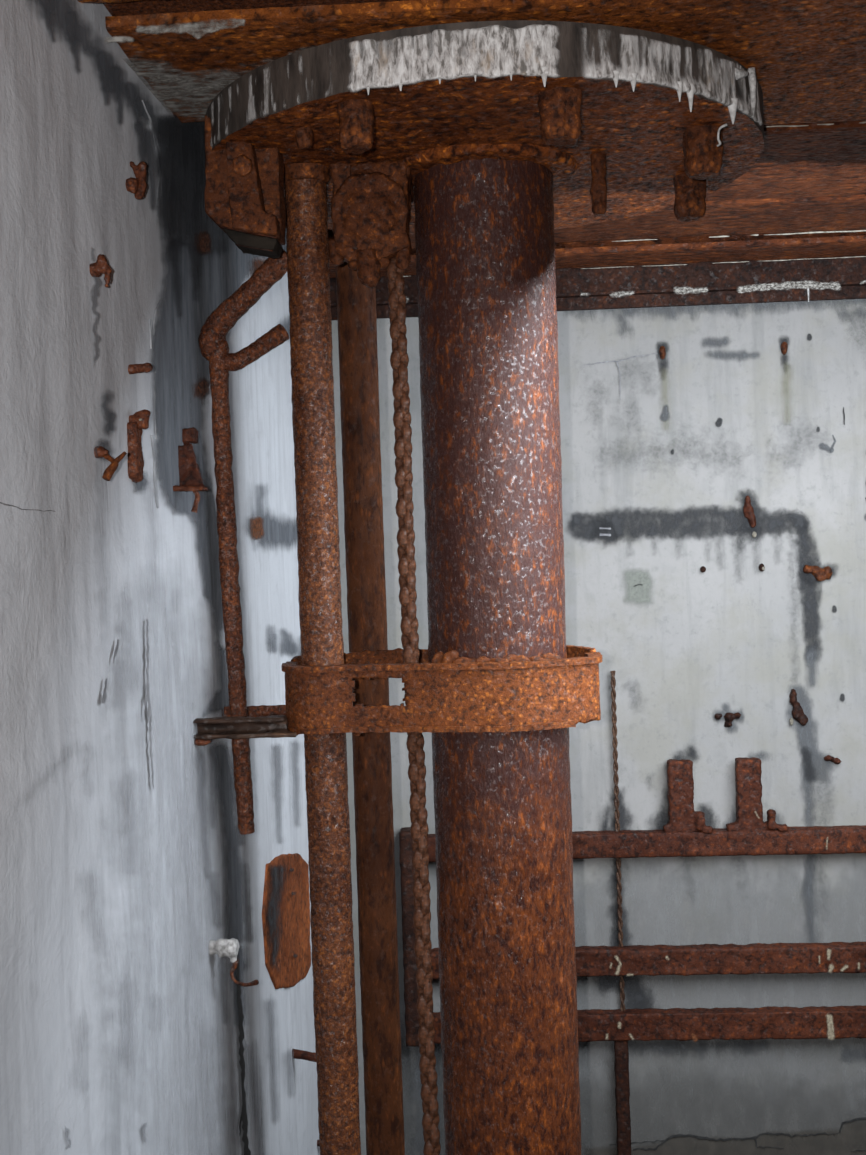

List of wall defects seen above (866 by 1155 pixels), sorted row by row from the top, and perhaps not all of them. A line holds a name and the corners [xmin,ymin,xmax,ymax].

damp [347,24,560,95]
damp [583,28,834,147]
rust [657,343,668,378]
rust [780,338,789,371]
crack [0,502,55,512]
damp [569,492,835,831]